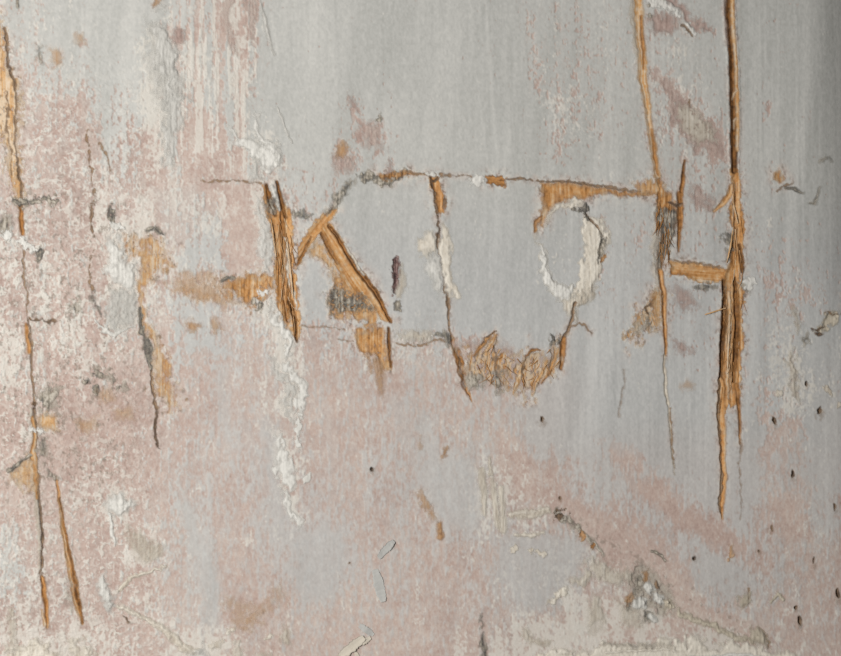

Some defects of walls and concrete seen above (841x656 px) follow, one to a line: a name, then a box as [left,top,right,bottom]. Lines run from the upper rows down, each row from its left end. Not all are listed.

crack [202,178,262,186]
crack [359,168,665,196]
crack [0,21,83,628]
peeling [224,113,406,527]
spalling [465,332,566,395]
crack [150,370,159,447]